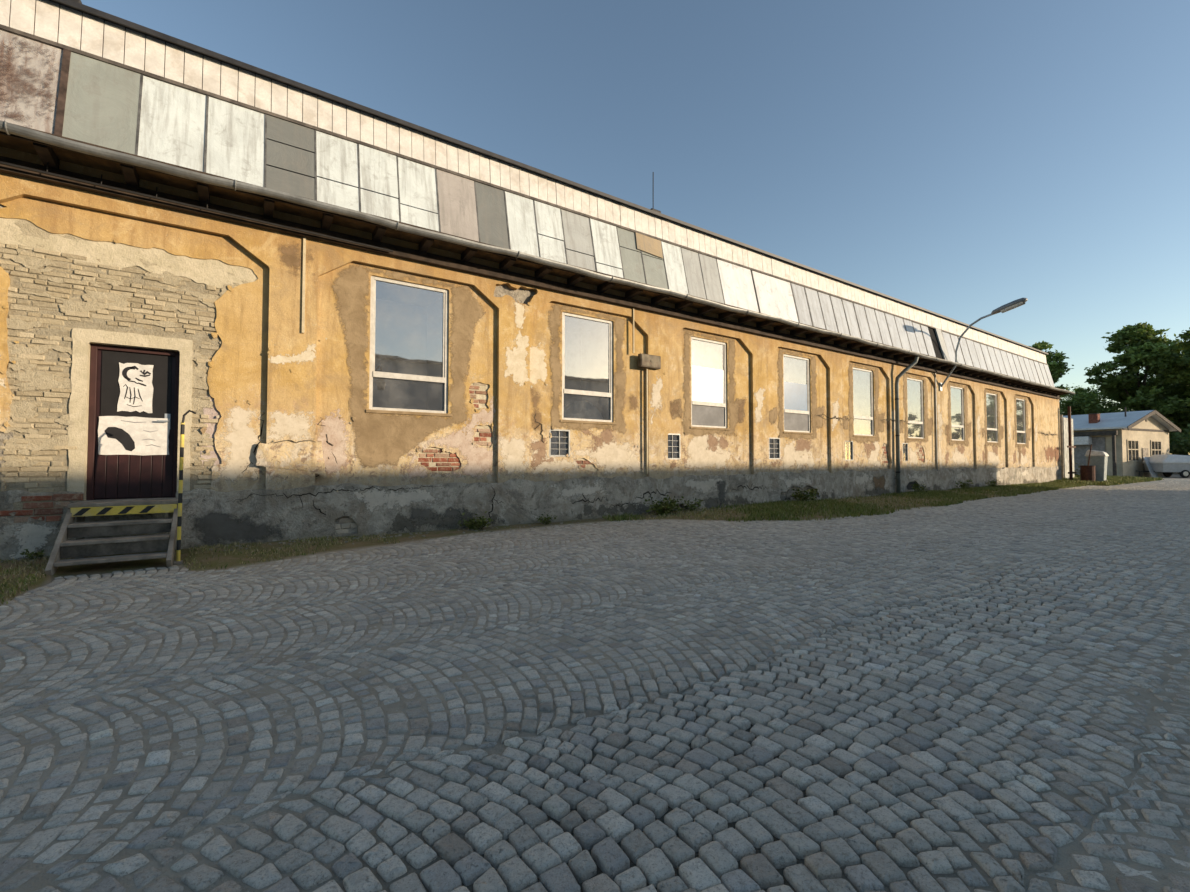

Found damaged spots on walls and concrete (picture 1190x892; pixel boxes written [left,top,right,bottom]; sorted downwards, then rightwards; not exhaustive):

rust [0,37,59,120]
flaking render [0,205,356,559]
peeling [494,285,547,388]
crack [228,417,445,515]
peeling [337,382,644,512]